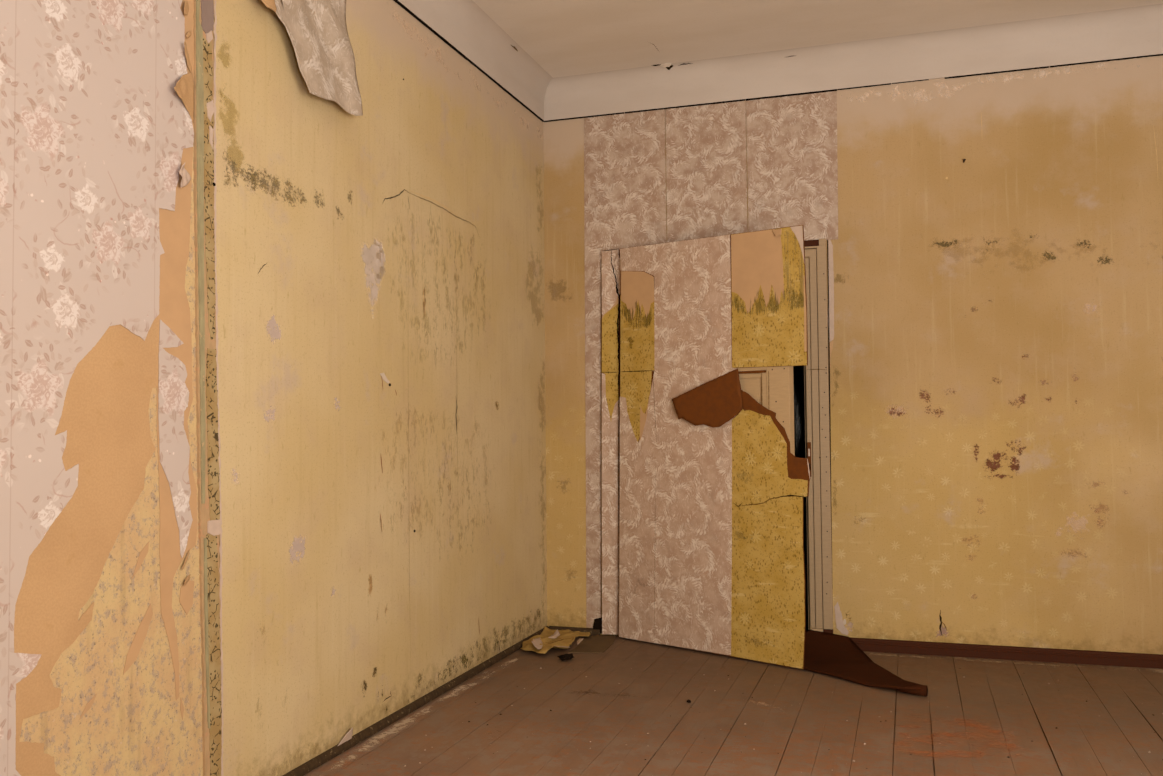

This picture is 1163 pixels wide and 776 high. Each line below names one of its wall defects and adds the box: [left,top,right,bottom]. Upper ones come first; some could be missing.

peeling [19,178,221,776]
leakage [223,152,323,208]